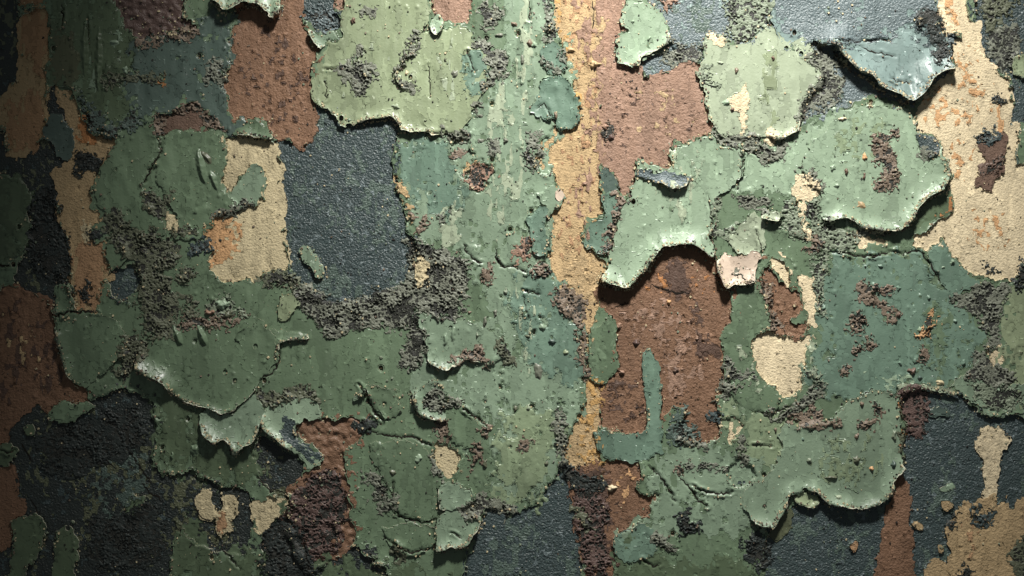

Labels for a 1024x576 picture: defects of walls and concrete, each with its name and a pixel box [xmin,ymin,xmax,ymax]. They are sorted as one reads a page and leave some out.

peeling [0,0,513,576]
spalling [370,0,1024,576]